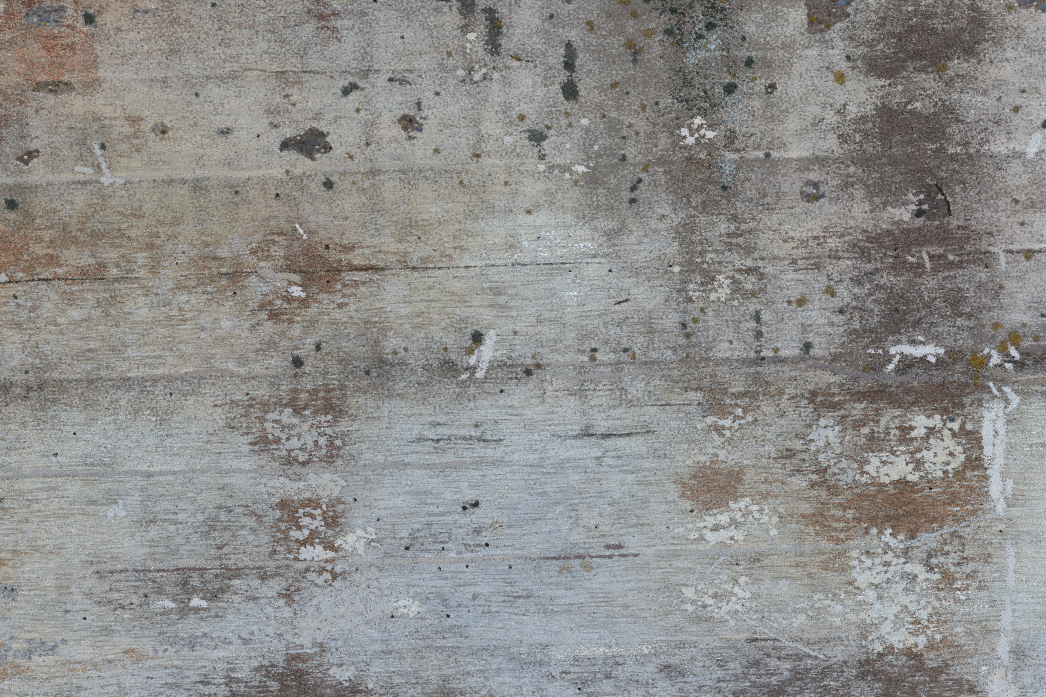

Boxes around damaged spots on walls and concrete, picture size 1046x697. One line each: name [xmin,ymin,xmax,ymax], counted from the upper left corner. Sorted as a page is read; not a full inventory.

corrosion [0,0,256,165]
corrosion [0,199,469,362]
spalling [267,122,335,159]
damp [635,0,816,454]
damp [804,0,1046,394]
damp [77,488,529,655]
peeling [232,407,425,648]
peeling [675,492,786,549]
peeling [672,528,989,654]
peeling [798,412,983,486]
damp [138,666,247,697]
damp [355,667,470,697]